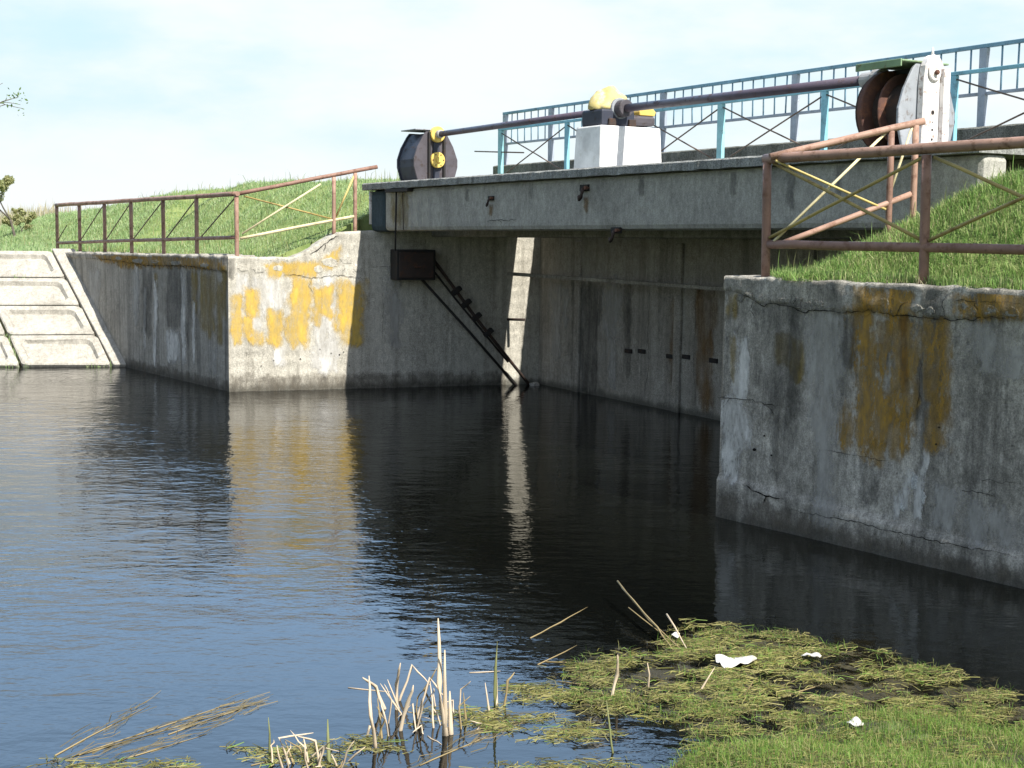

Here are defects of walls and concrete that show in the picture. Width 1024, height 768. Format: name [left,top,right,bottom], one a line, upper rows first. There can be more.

water stain [118,255,238,391]
crack [735,291,1023,321]
water stain [258,375,365,391]
water stain [893,318,962,531]
crack [746,485,1015,557]